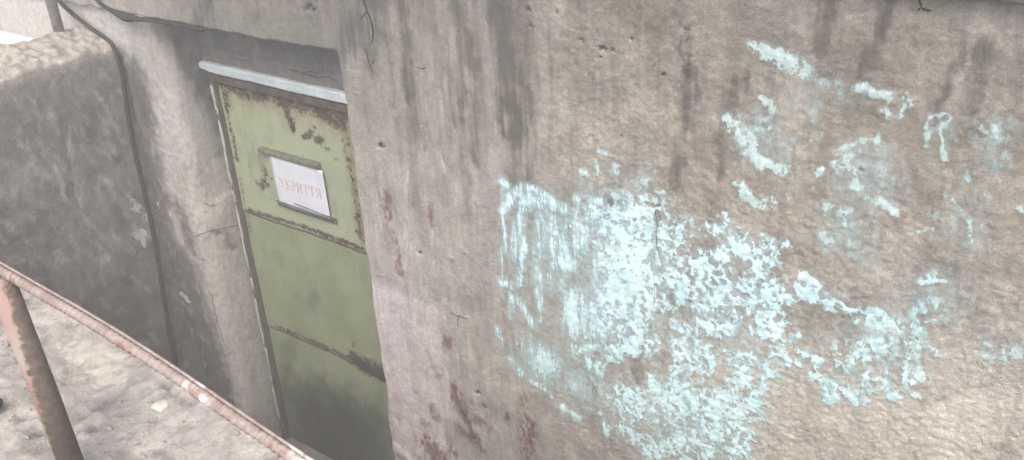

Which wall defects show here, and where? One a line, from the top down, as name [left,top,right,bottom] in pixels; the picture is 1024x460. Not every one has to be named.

crack [360,0,374,72]
water stain [458,0,523,163]
peeling [722,94,796,178]
peeling [747,41,914,143]
peeling [923,112,956,162]
peeling [980,120,1017,173]
peeling [814,133,990,272]
peeling [495,149,980,460]